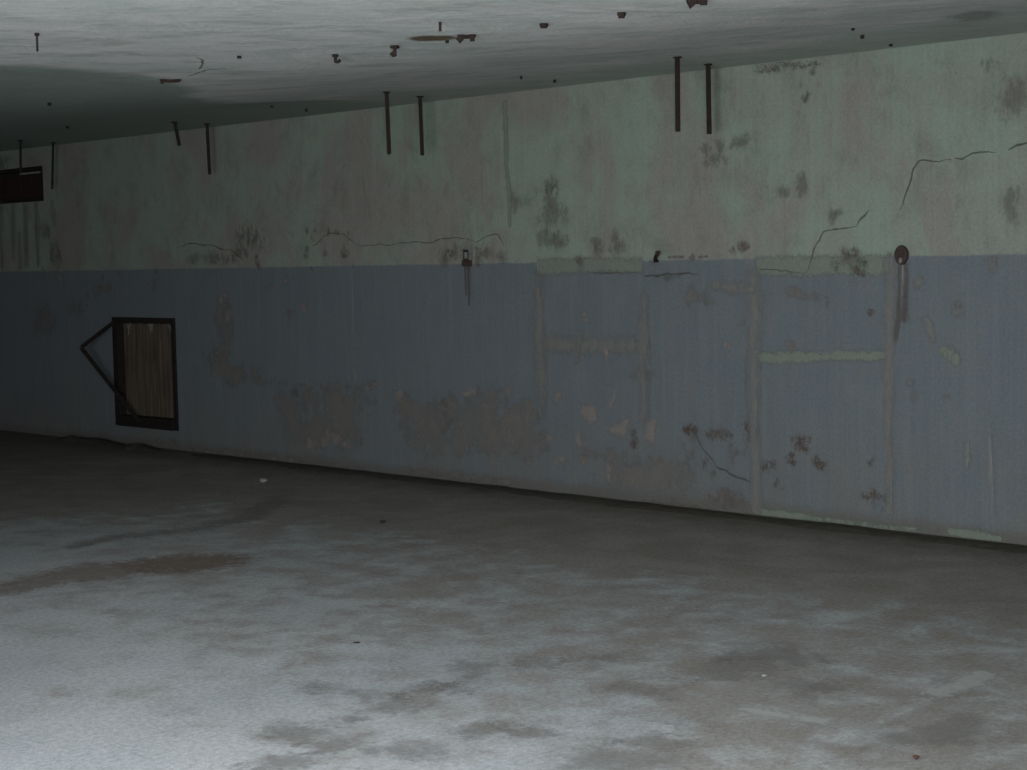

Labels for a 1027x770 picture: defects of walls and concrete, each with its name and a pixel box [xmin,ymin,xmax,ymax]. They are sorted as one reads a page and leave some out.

crack [900,142,1027,210]
crack [312,233,504,247]
crack [759,210,869,273]